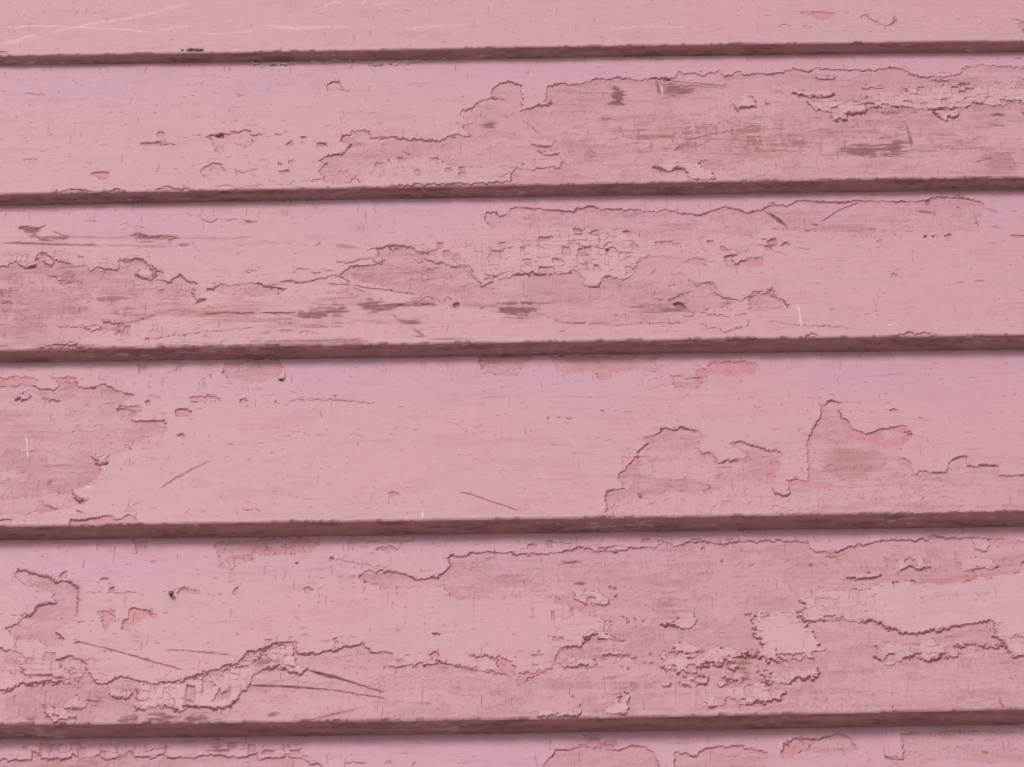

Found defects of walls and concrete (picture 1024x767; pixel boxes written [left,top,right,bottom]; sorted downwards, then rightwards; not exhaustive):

peeling [275,64,1024,188]
peeling [0,250,368,351]
peeling [340,195,985,327]
peeling [887,323,932,337]
peeling [0,375,223,527]
peeling [604,399,1024,518]
peeling [0,533,1024,725]
peeling [0,748,324,767]
peeling [543,744,661,767]
peeling [672,731,861,767]
peeling [882,729,1024,766]